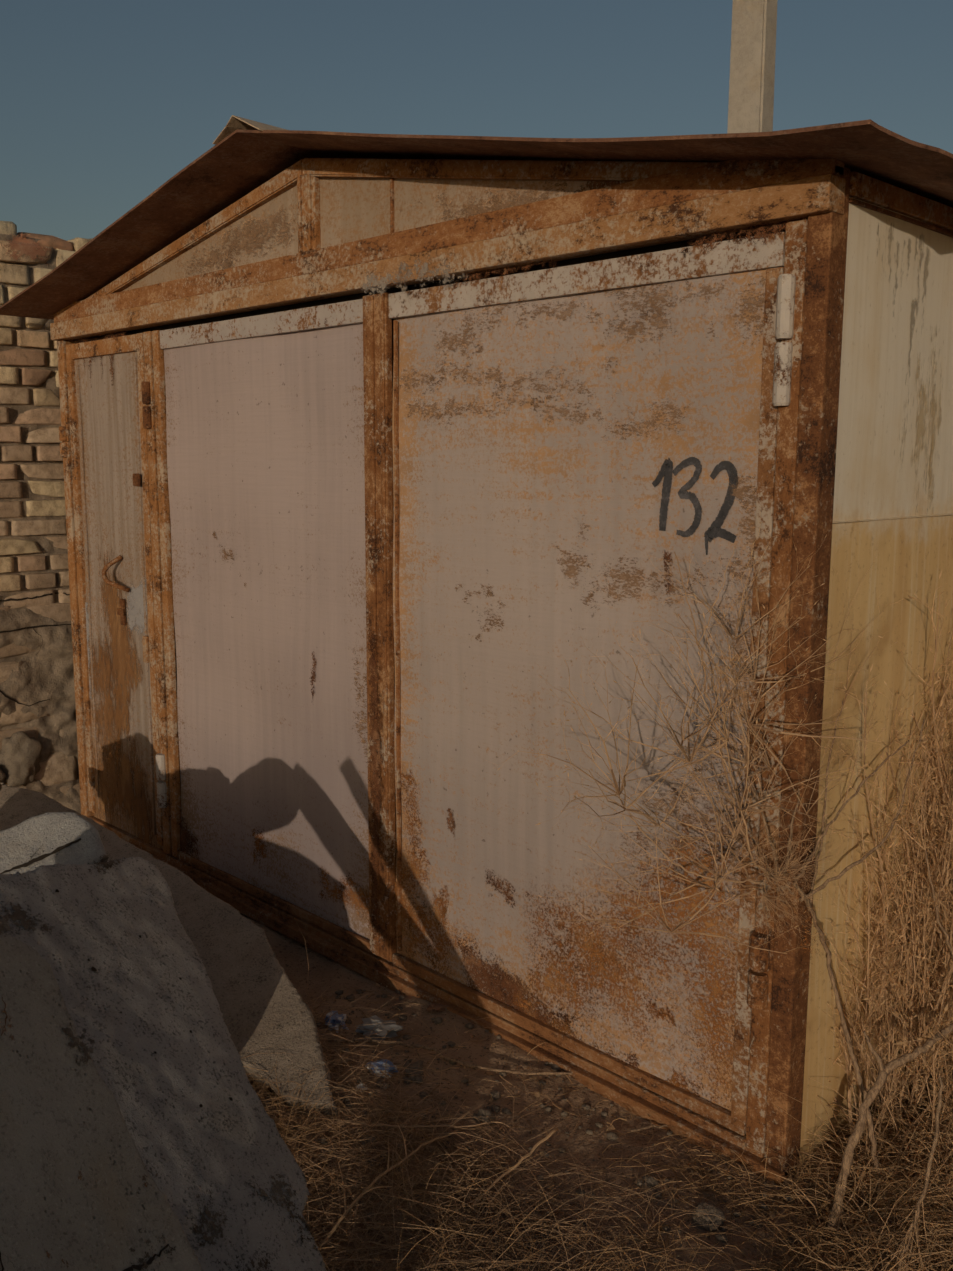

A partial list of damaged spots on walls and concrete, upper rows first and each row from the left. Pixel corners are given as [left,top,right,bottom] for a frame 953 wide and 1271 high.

rust [186,204,295,277]
rust [89,549,143,782]
rust [663,552,675,594]
rust [318,631,744,1110]